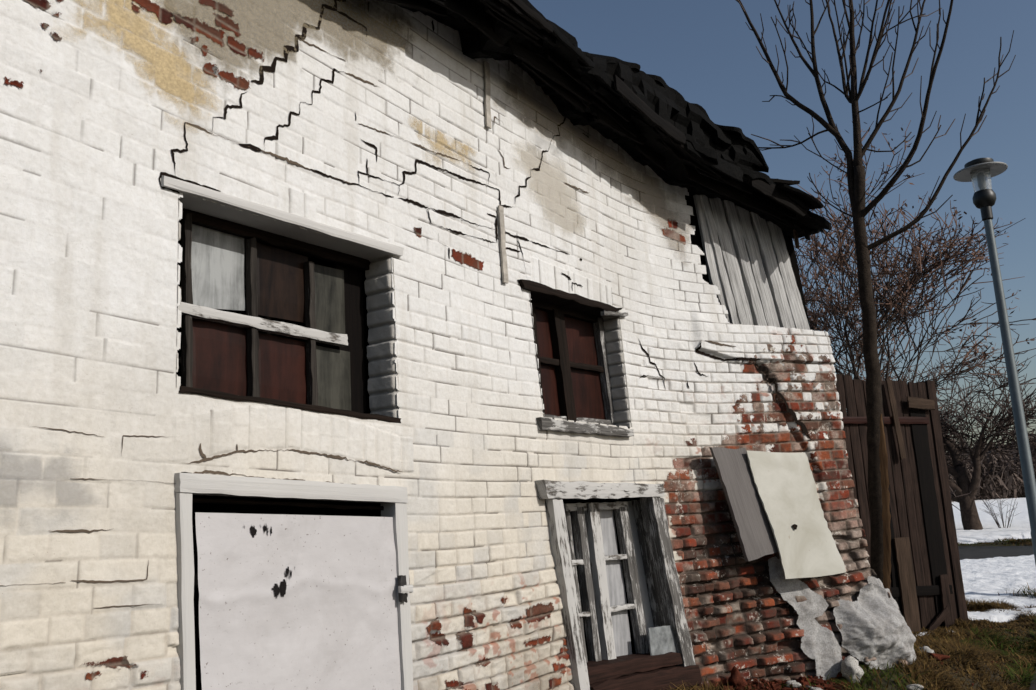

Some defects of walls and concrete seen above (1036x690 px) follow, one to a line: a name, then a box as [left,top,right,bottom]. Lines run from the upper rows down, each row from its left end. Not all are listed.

peeling [132,0,265,90]
crack [159,0,589,291]
peeling [662,219,686,245]
peeling [452,249,484,271]
crack [639,340,811,439]
spalling [663,332,891,690]
peeling [426,607,485,651]
peeling [509,602,563,629]
peeling [445,679,500,690]
peeling [524,636,570,690]